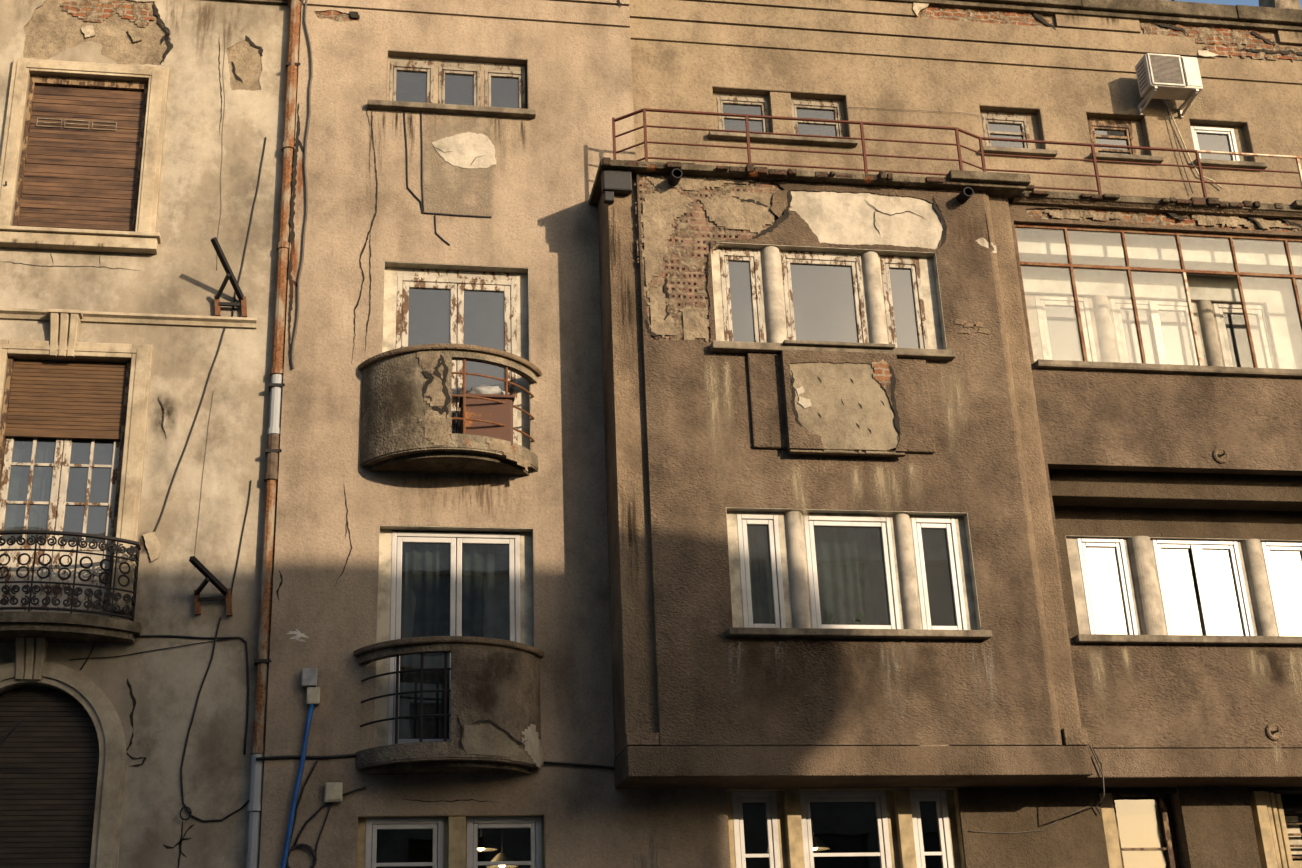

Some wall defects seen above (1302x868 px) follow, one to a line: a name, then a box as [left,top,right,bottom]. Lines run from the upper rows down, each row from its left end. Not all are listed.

peeling [23,0,173,65]
crack [216,37,224,133]
peeling [227,36,263,91]
flaking render [912,2,1056,30]
flaking render [1139,22,1302,61]
crack [351,108,378,364]
peeling [602,157,961,342]
flaking render [1024,185,1302,232]
peeling [417,350,452,446]
peeling [790,359,901,454]
crack [334,487,353,587]